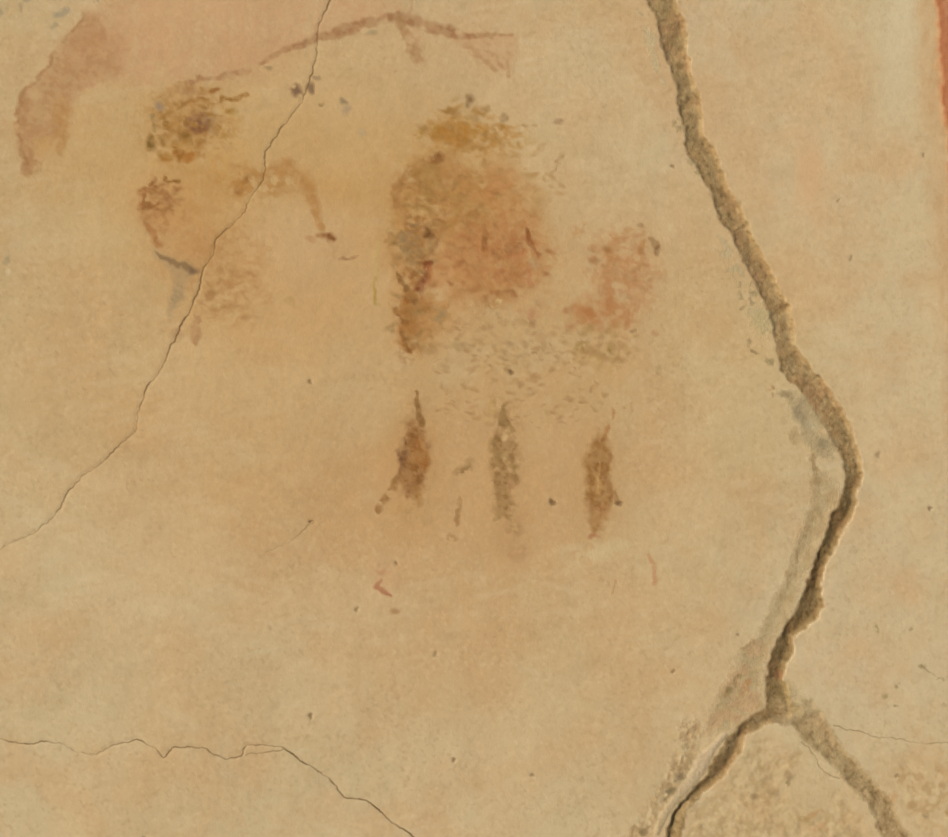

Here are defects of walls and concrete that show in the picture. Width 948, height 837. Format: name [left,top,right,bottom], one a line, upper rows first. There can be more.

crack [0,0,331,554]
crack [620,0,948,837]
crack [0,738,415,837]